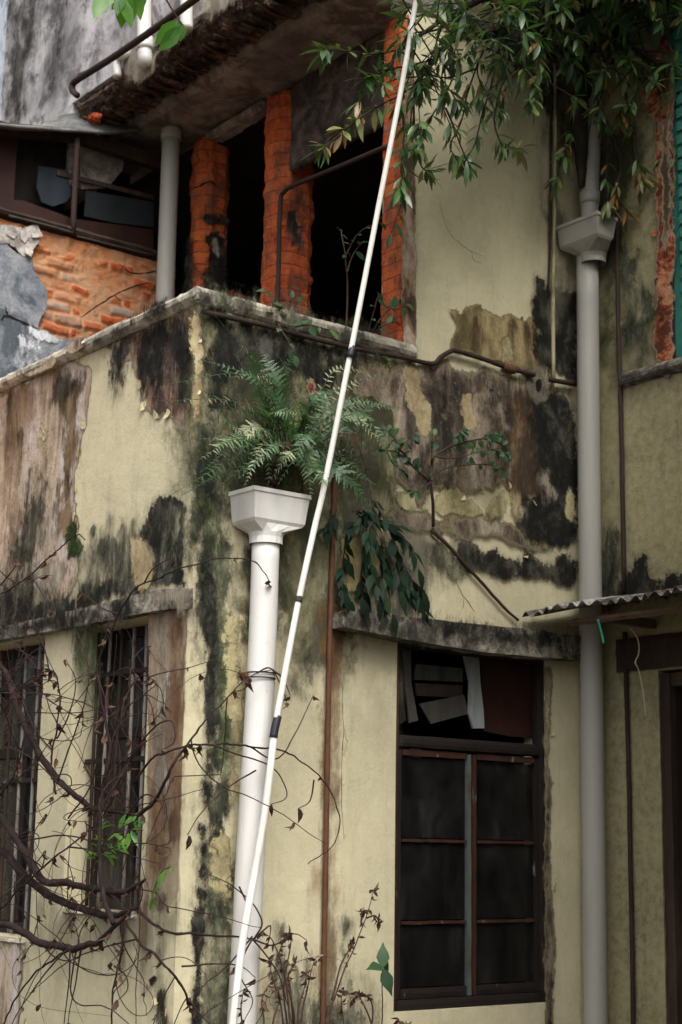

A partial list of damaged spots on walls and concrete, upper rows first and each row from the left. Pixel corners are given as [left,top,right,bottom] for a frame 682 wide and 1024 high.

leakage [0,0,41,123]
leakage [43,0,67,96]
peeling [6,225,43,257]
flaking render [632,24,677,379]
corrosion [146,609,187,871]
leakage [0,210,379,1024]
flaking render [351,303,555,553]
leakage [350,260,580,651]
leakage [602,525,682,609]